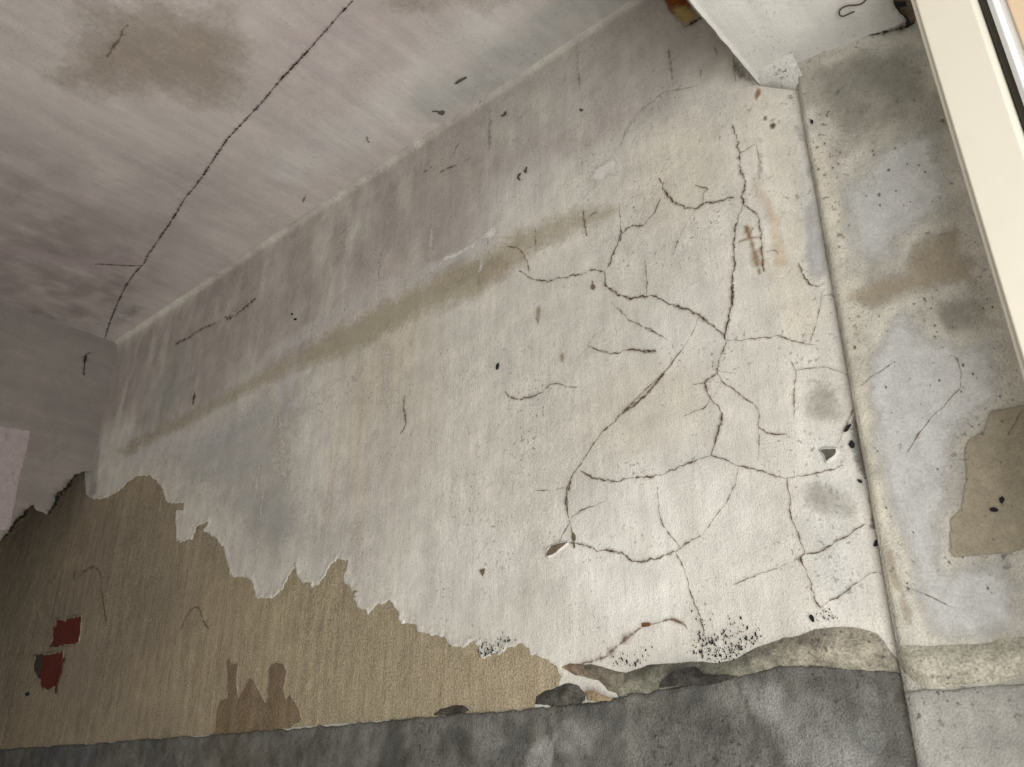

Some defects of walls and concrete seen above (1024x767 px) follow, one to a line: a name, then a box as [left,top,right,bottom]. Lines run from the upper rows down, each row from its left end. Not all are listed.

crack [83,0,353,375]
damp [126,210,596,452]
crack [505,125,889,665]
rust [740,226,765,274]
damp [856,231,994,348]
crack [908,355,961,451]
peeling [950,405,1024,557]
peeling [0,469,585,750]